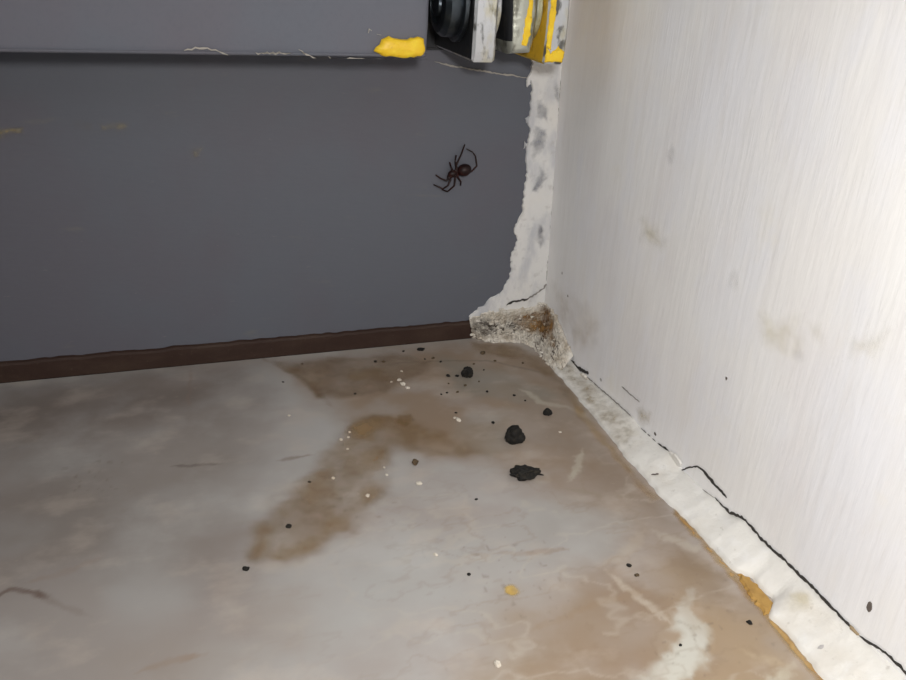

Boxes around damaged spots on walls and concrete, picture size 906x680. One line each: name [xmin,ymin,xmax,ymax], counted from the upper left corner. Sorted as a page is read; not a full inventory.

peeling [469,60,573,370]
crack [570,359,668,451]
crack [682,466,906,675]